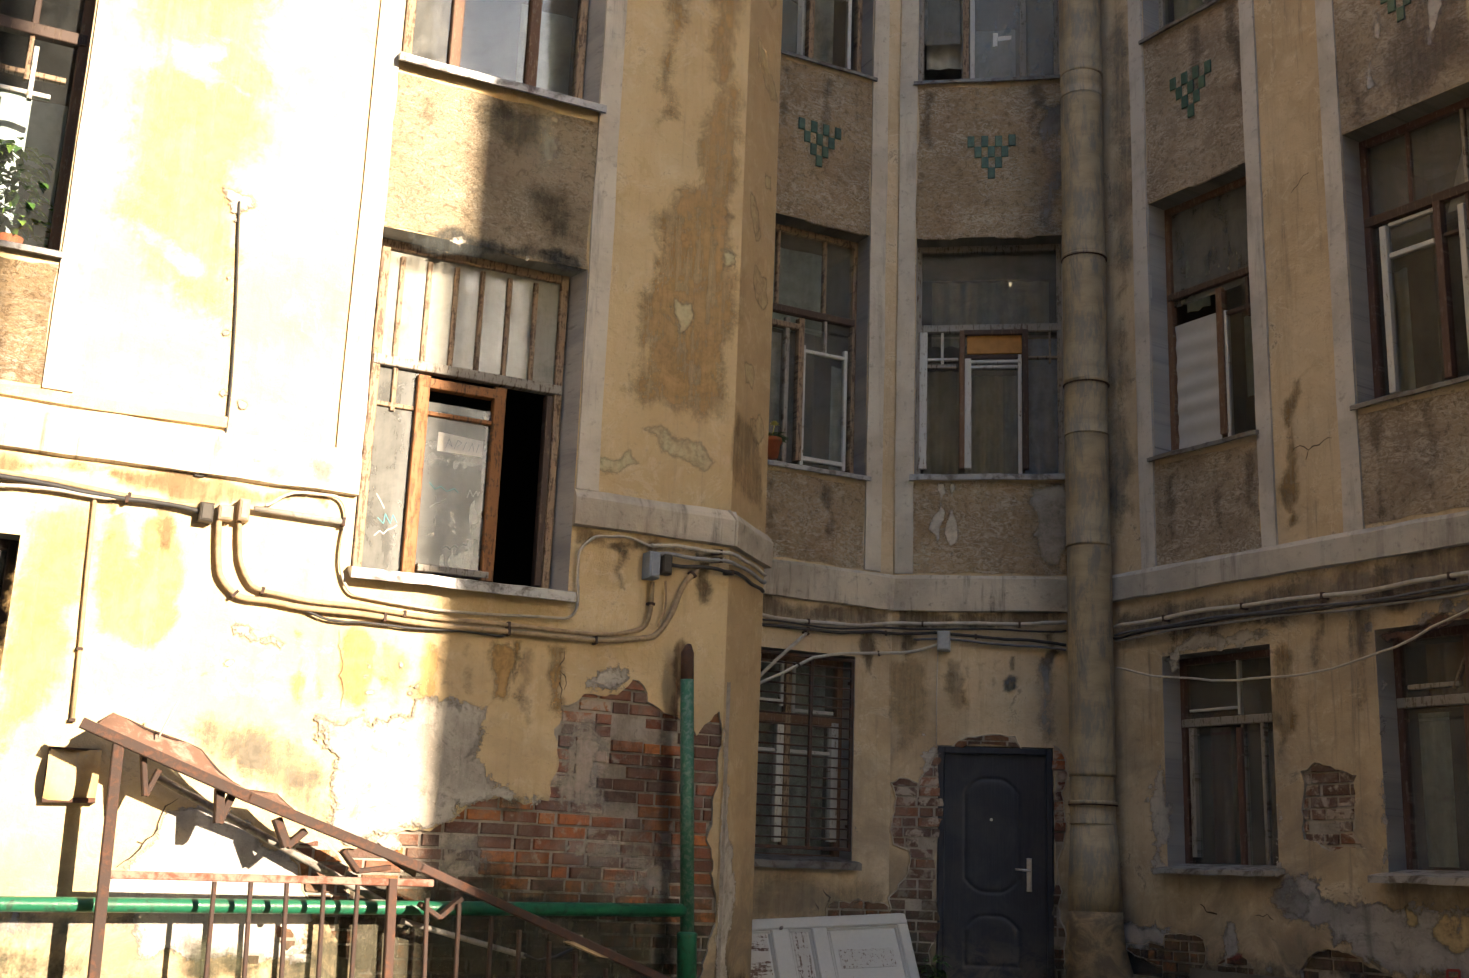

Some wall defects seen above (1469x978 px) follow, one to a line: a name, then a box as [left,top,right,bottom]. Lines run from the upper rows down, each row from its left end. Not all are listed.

leakage [119,0,271,303]
leakage [638,0,739,415]
leakage [0,513,182,747]
peeling [231,622,286,649]
flaking render [109,663,736,978]
flaking render [815,732,1022,978]
peeling [1124,920,1171,951]
flaking render [1301,763,1365,851]
peeling [1276,839,1469,978]